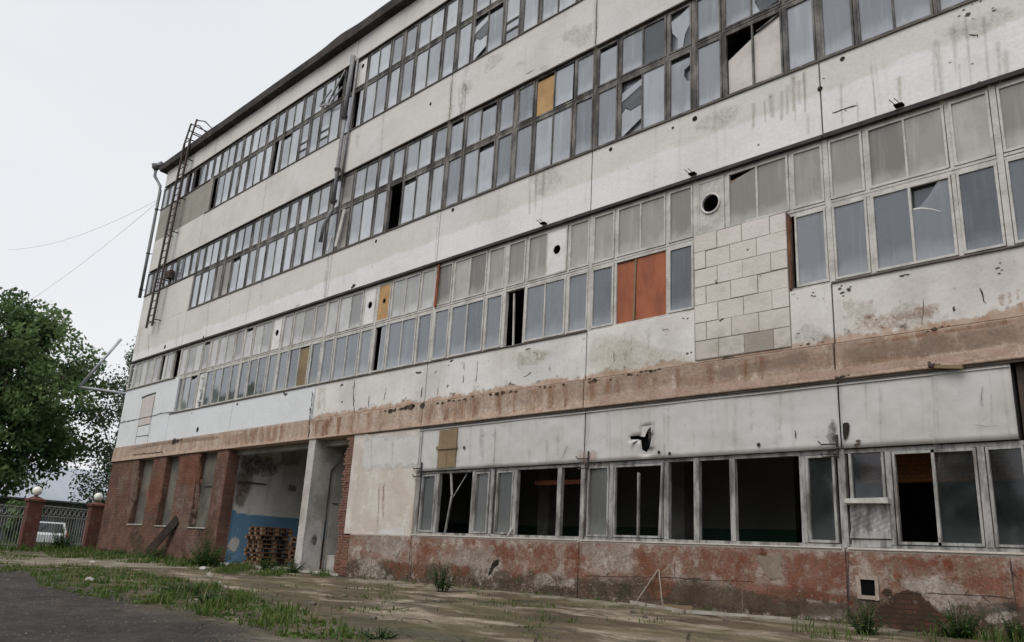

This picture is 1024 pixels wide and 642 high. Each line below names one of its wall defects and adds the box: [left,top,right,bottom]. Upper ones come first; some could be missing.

spalling [384,390,518,414]
peeling [591,345,1011,404]
spalling [842,422,861,447]
leakage [235,455,277,505]
spalling [357,527,853,620]
spalling [868,556,982,634]
spalling [986,563,1024,623]